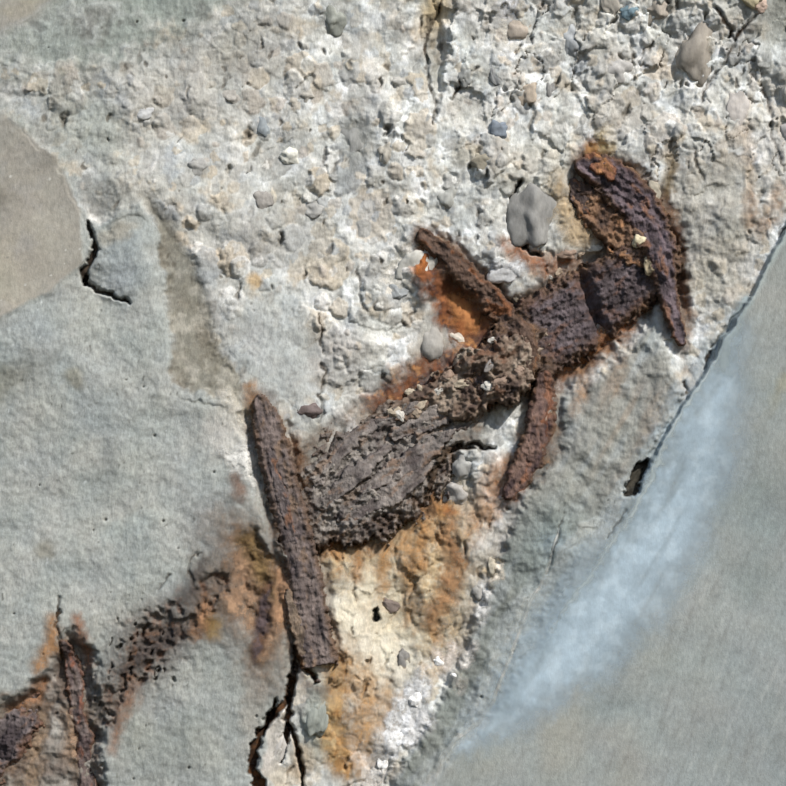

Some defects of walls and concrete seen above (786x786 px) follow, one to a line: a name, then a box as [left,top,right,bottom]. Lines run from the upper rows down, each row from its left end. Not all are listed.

crack [80,222,130,304]
corrosion [365,246,494,410]
corrosion [502,241,574,275]
corrosion [554,181,606,247]
spalling [513,243,657,375]
spalling [568,152,690,347]
spalling [0,627,107,786]
corrosion [115,522,290,742]
crack [248,644,317,786]
spalling [251,394,339,669]
spalling [296,399,483,550]
corrosion [322,492,469,649]